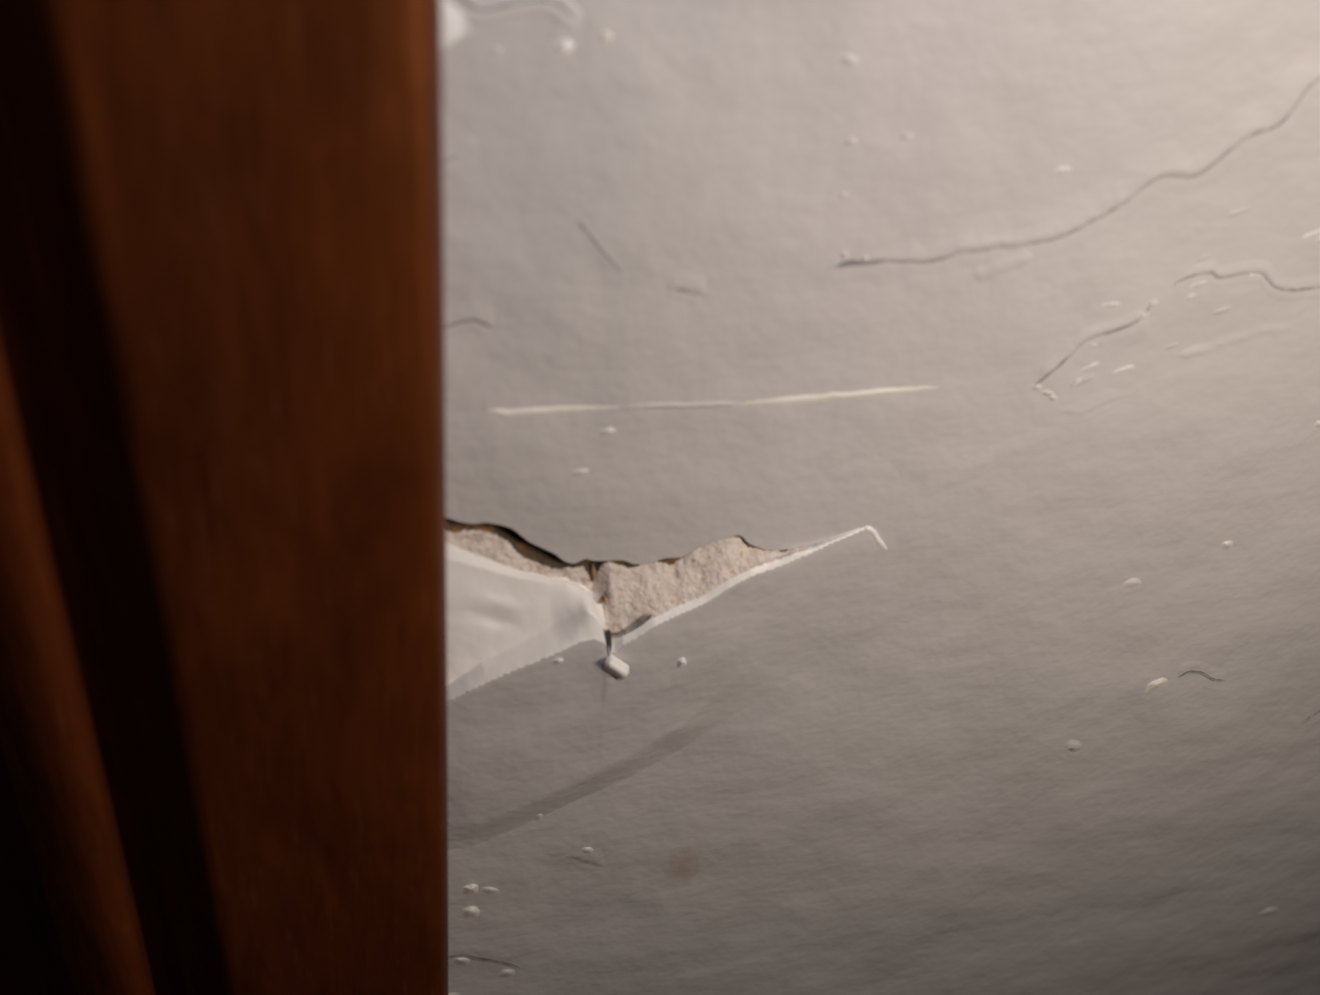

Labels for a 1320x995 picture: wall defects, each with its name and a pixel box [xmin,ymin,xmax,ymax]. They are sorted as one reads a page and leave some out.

spalling [446,526,887,702]